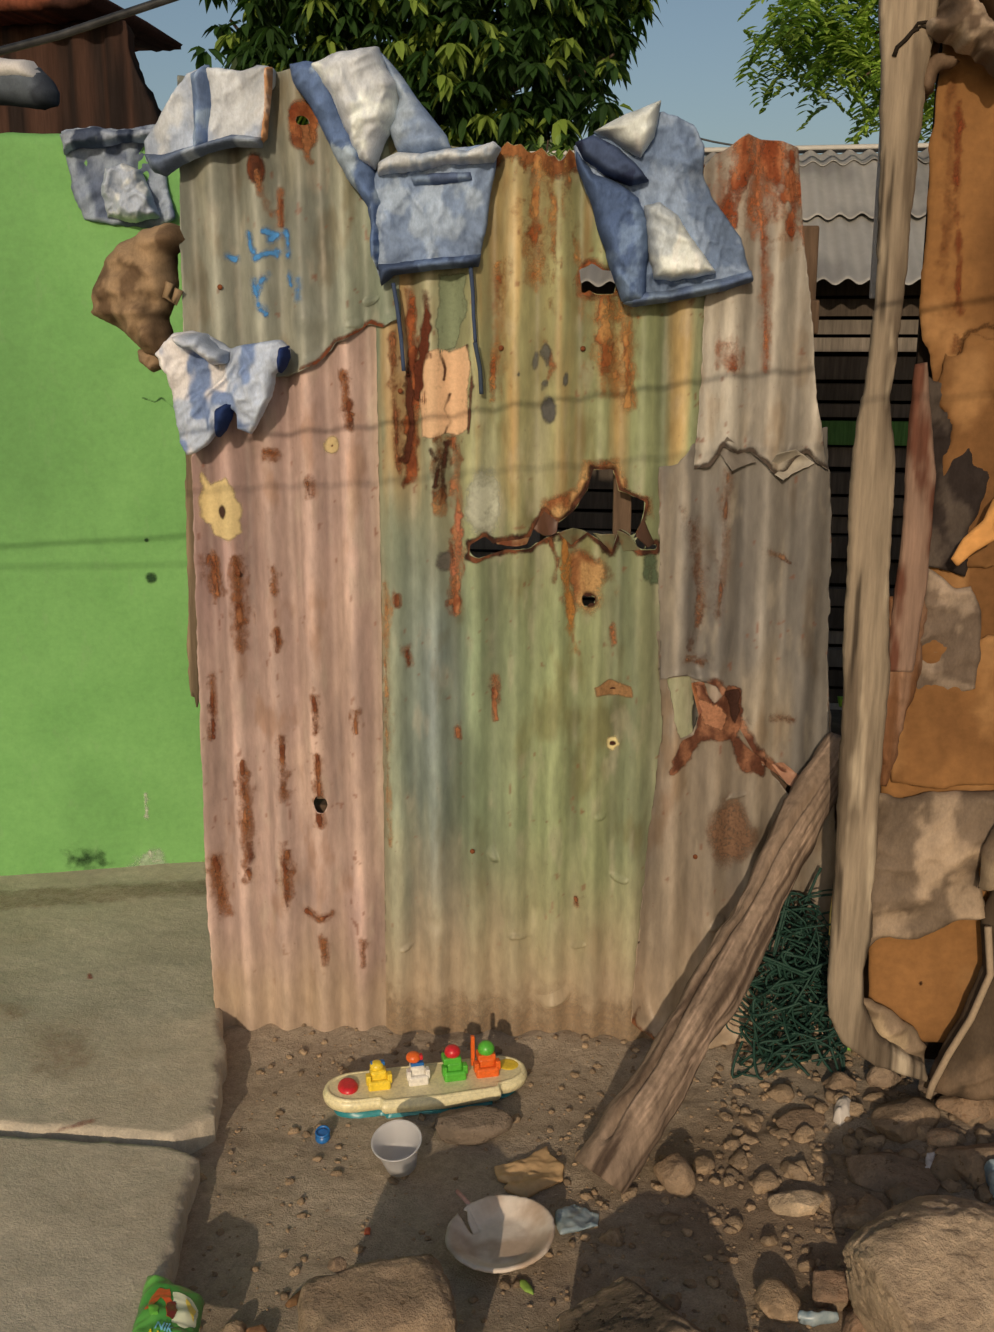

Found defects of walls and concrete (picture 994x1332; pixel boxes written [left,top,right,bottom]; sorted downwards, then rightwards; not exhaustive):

corrosion [288,100,318,163]
corrosion [496,142,578,281]
corrosion [719,134,804,370]
corrosion [574,254,639,408]
corrosion [299,294,465,615]
corrosion [541,459,627,517]
corrosion [206,553,250,652]
corrosion [698,689,740,731]
corrosion [239,760,254,883]
corrosion [279,737,290,799]
corrosion [313,753,324,829]
corrosion [280,850,296,903]